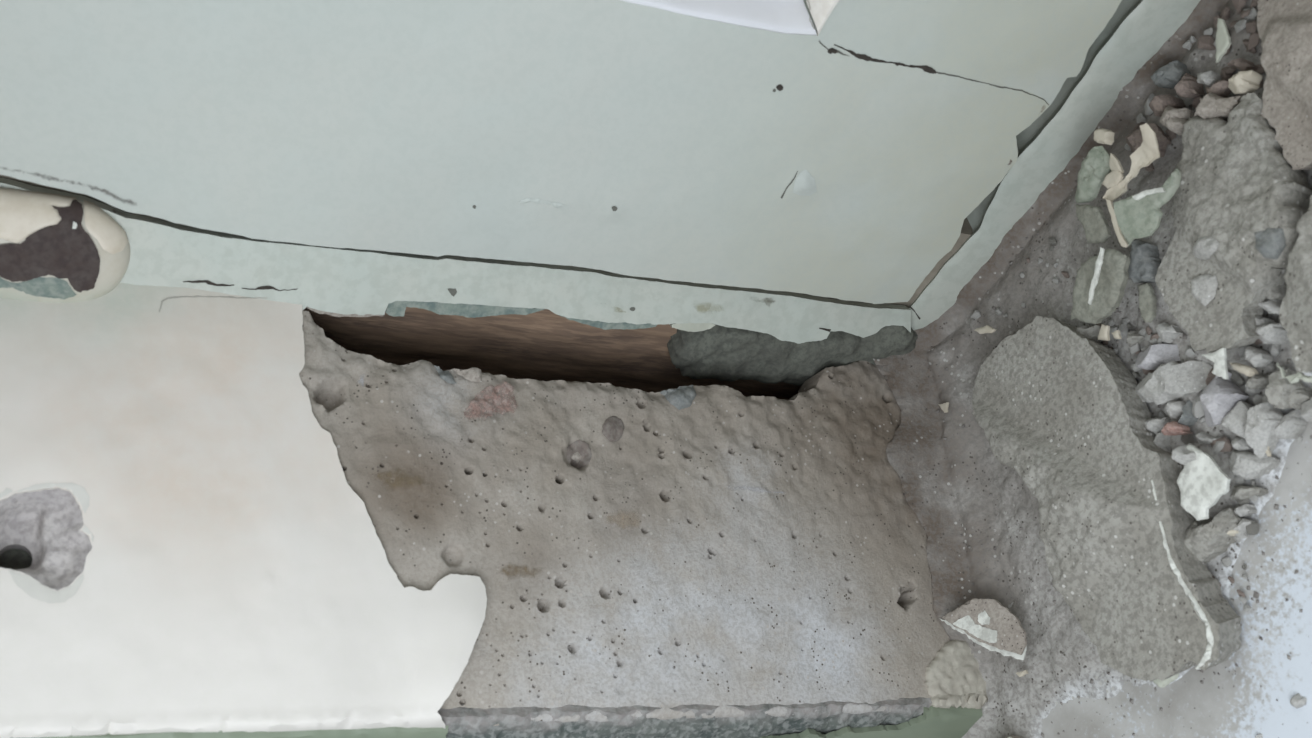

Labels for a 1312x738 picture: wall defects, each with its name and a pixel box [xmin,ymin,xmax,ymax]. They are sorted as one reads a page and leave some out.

crack [807,0,1049,105]
peeling [0,187,128,300]
peeling [14,483,94,542]
flaking render [299,288,1029,738]
peeling [8,570,84,603]